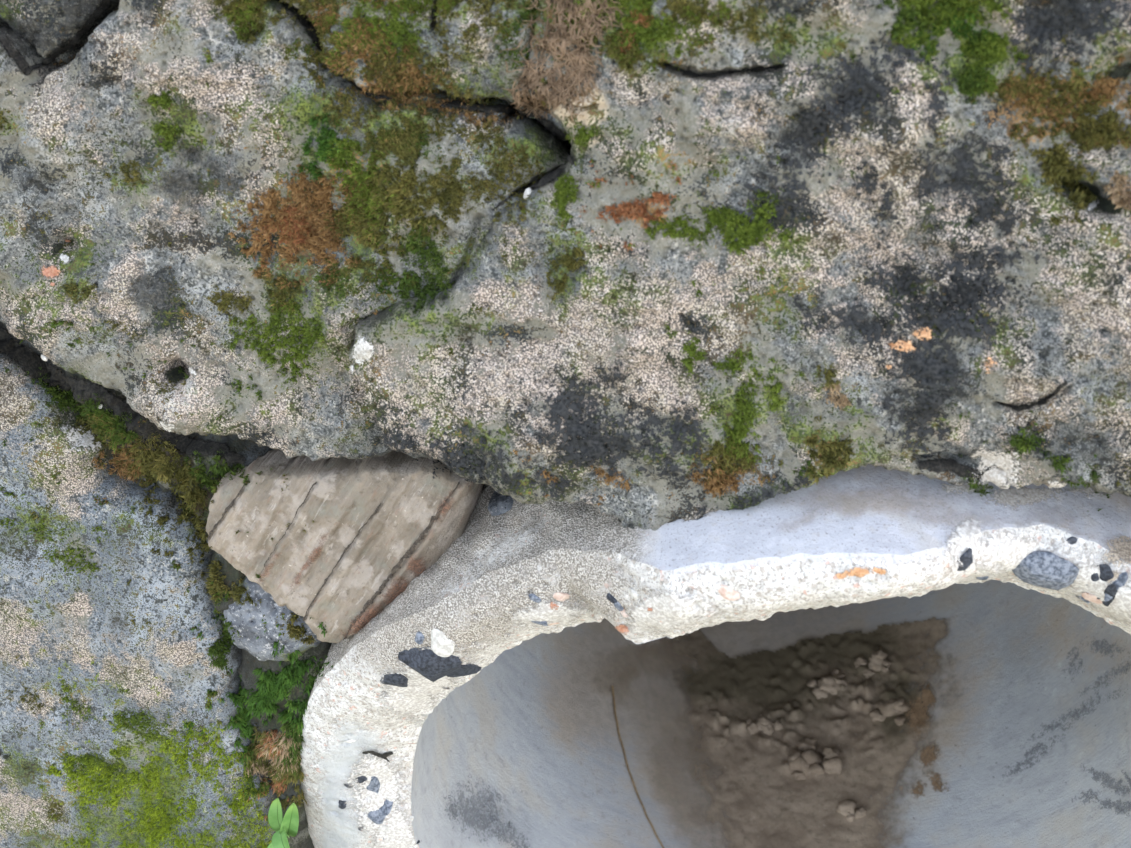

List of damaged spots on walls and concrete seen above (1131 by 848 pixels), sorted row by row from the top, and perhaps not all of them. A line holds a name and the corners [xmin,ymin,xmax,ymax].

crack [430,1,439,30]
crack [0,0,111,75]
crack [663,63,782,78]